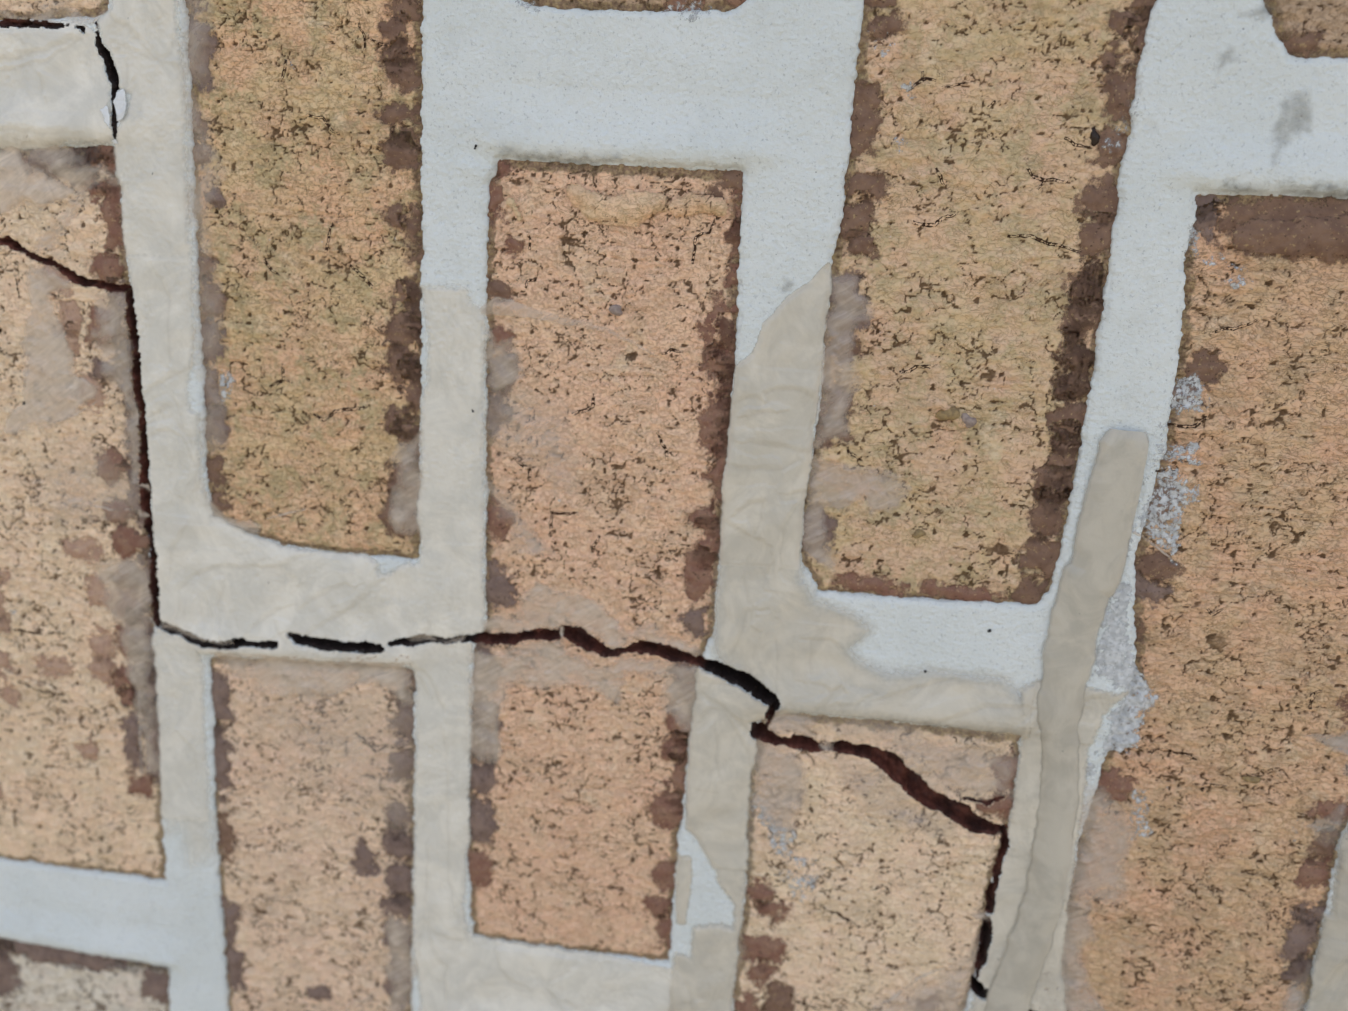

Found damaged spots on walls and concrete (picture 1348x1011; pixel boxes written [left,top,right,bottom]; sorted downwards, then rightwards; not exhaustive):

crack [358,22,389,50]
crack [0,18,120,139]
crack [908,71,966,91]
crack [913,168,956,228]
crack [1026,168,1068,190]
crack [325,222,373,289]
crack [691,216,717,264]
crack [1007,234,1078,253]
crack [1215,319,1258,333]
crack [1167,416,1207,428]
crack [0,232,1010,999]
crack [1148,748,1225,792]